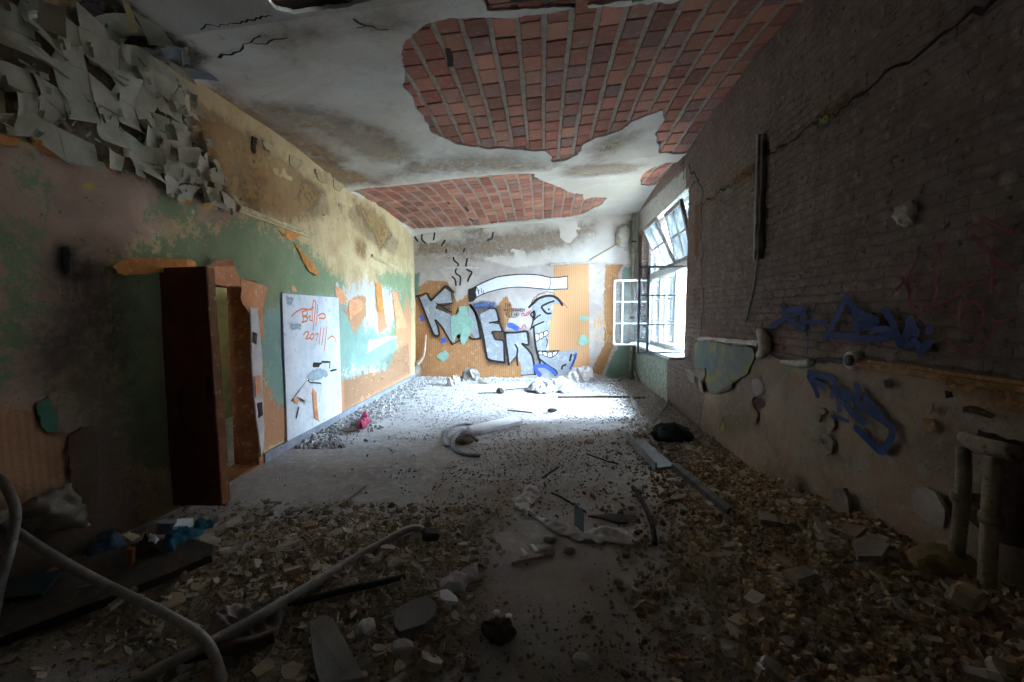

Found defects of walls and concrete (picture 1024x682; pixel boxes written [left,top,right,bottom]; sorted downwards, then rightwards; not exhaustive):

crack [200,15,288,59]
crack [353,18,389,31]
peeling [0,0,242,216]
flaking render [251,136,275,154]
flaking render [299,169,606,229]
flaking render [401,0,804,185]
crack [680,0,997,336]
flaking render [685,340,765,426]